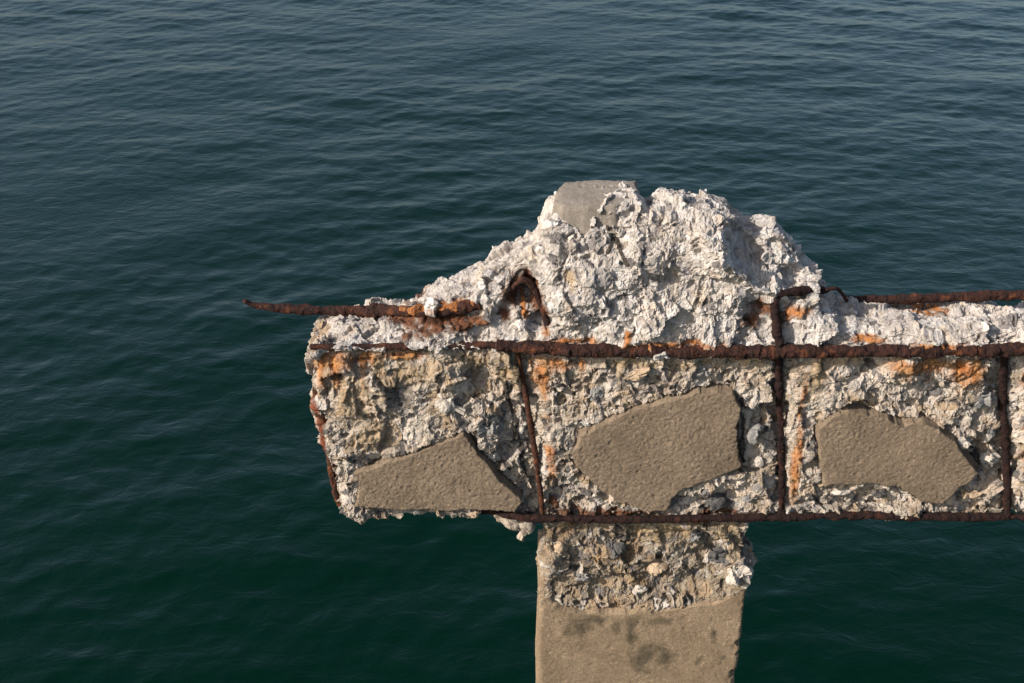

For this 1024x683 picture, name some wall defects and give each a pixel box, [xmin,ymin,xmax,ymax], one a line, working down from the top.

rust [388,267,597,359]
rust [316,351,374,385]
rust [645,339,724,352]
rust [854,334,884,343]
rust [889,343,984,385]
rust [310,400,325,451]
spalling [304,315,1024,613]
rust [790,433,803,494]
rust [545,496,655,525]